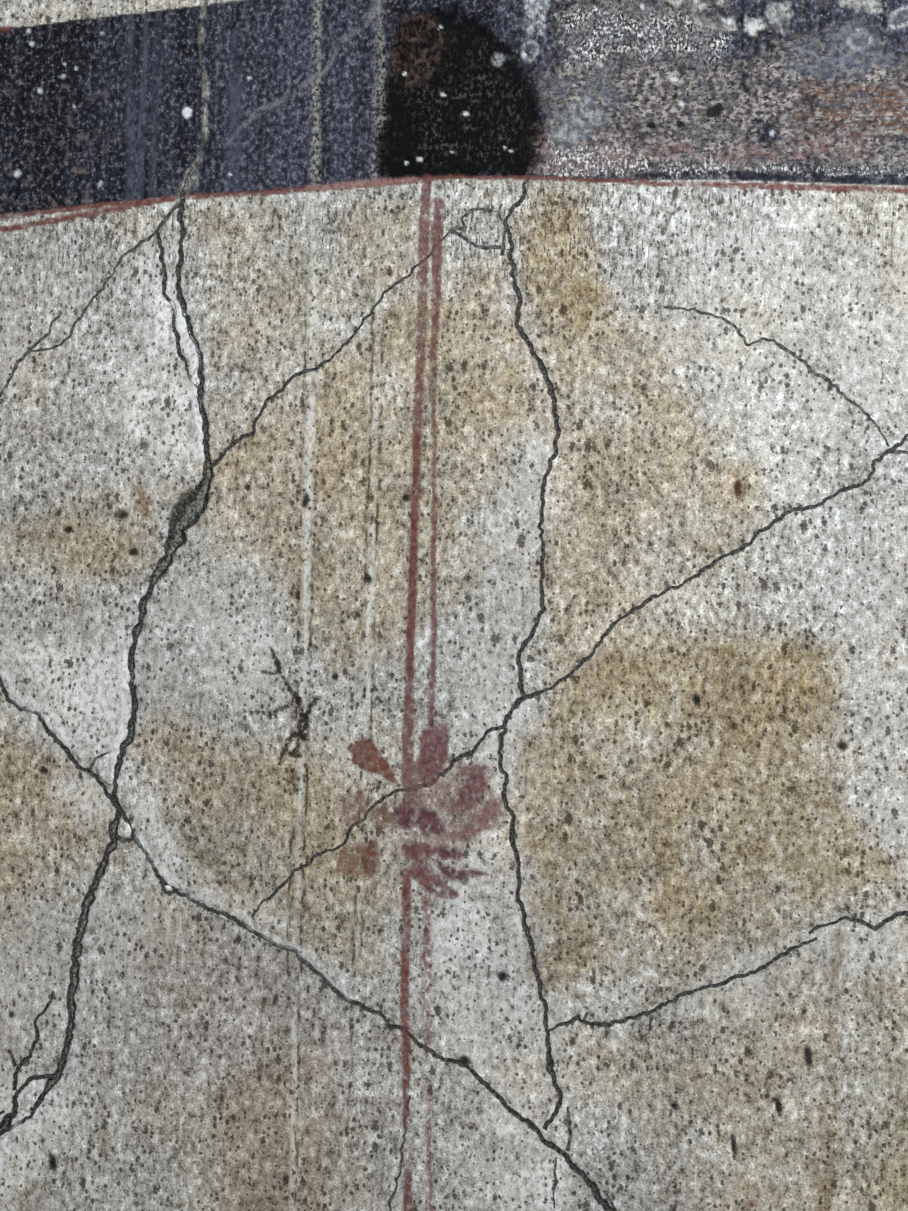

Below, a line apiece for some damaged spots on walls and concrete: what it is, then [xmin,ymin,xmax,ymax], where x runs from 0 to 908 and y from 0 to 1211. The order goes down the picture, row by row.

damp [308,231,319,357]
crack [0,0,617,1211]
damp [303,372,315,650]
crack [209,166,908,1130]
damp [145,807,179,865]
damp [440,893,494,1008]